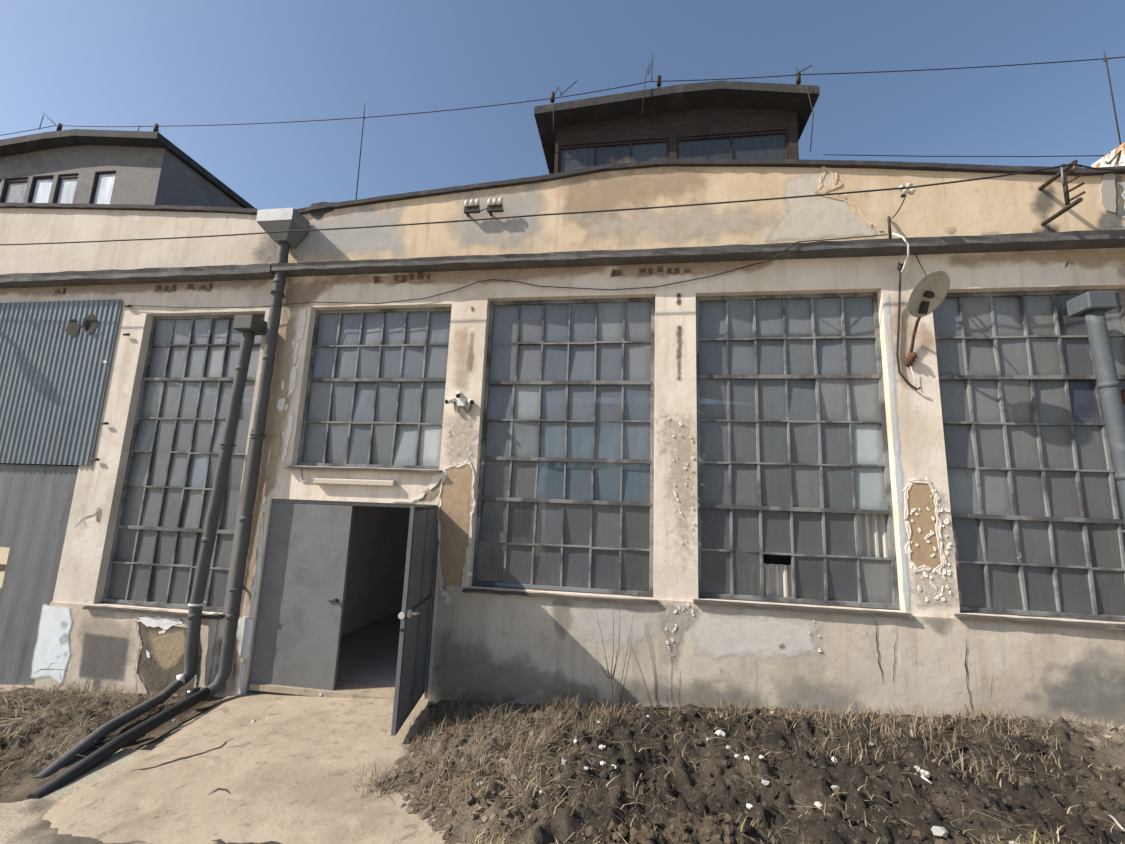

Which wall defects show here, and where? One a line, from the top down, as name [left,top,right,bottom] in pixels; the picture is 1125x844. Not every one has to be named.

water stain [568,166,781,240]
peeling [766,166,884,242]
peeling [236,309,307,694]
flaking render [391,456,476,605]
flaking render [903,477,958,608]
spalling [133,616,200,696]
crack [875,620,897,686]
crack [965,641,993,712]